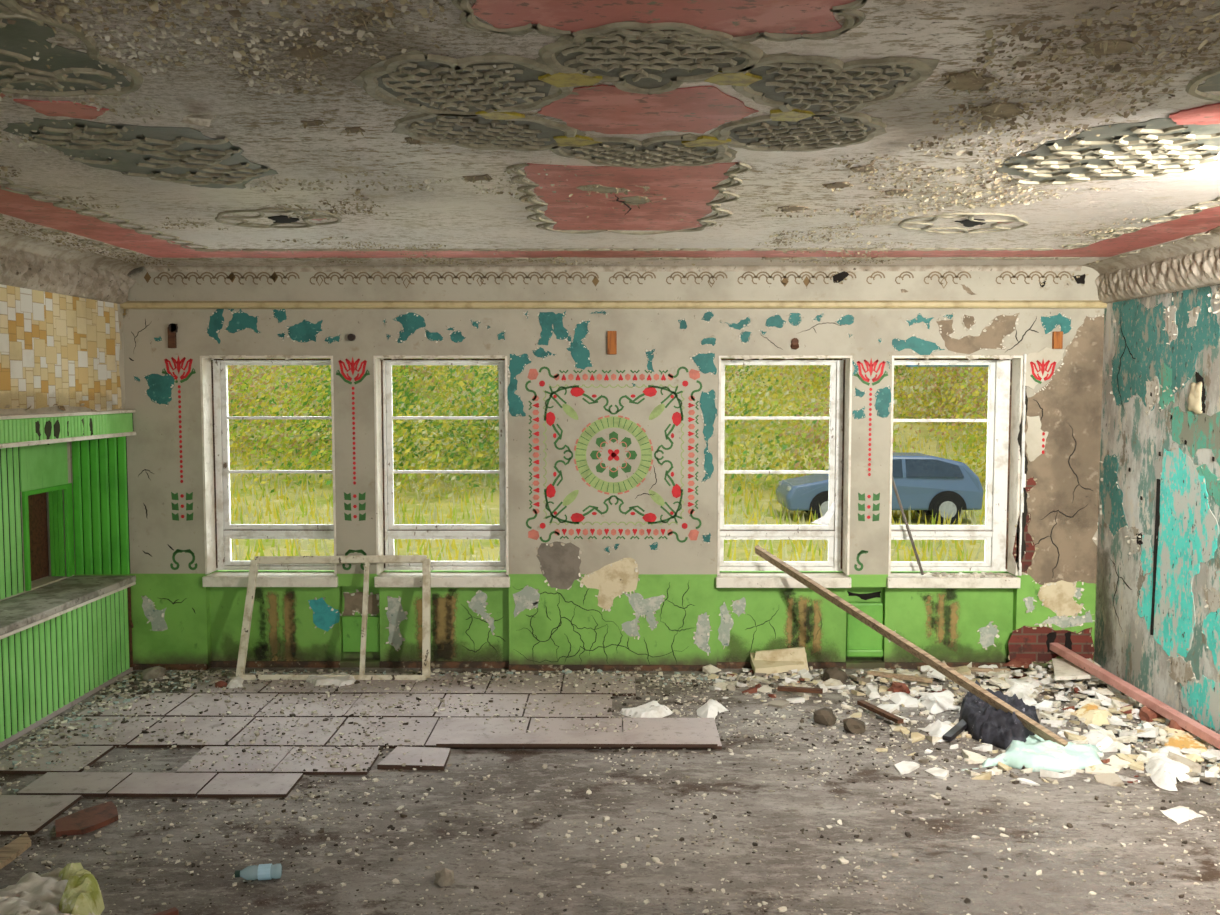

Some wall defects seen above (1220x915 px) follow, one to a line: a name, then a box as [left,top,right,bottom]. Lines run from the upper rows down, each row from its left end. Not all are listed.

peeling [0,0,454,138]
peeling [744,0,1220,285]
peeling [236,162,666,220]
peeling [383,311,607,417]
peeling [852,359,895,419]
crack [1017,386,1093,578]
flaking render [308,589,408,651]
crack [461,582,695,665]
flaking render [513,541,665,640]
crack [745,609,779,655]
water stain [792,607,813,646]
water stain [931,588,957,644]